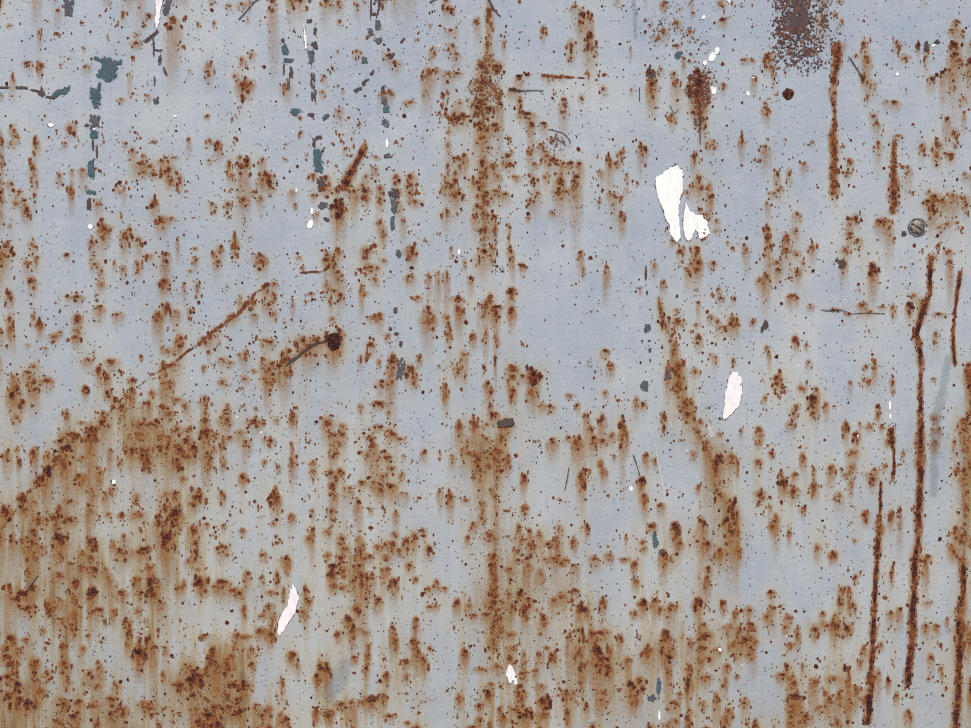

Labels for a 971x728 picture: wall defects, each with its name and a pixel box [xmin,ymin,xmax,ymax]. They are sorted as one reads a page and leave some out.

rust [0,0,158,109]
peeling [144,0,172,104]
rust [0,114,86,224]
rust [364,0,655,289]
peeling [655,165,710,243]
rust [816,31,921,244]
peeling [723,371,743,421]
rust [748,335,855,432]
rust [844,325,906,396]
rust [616,452,684,512]
peeling [277,584,299,636]
rust [283,584,314,669]